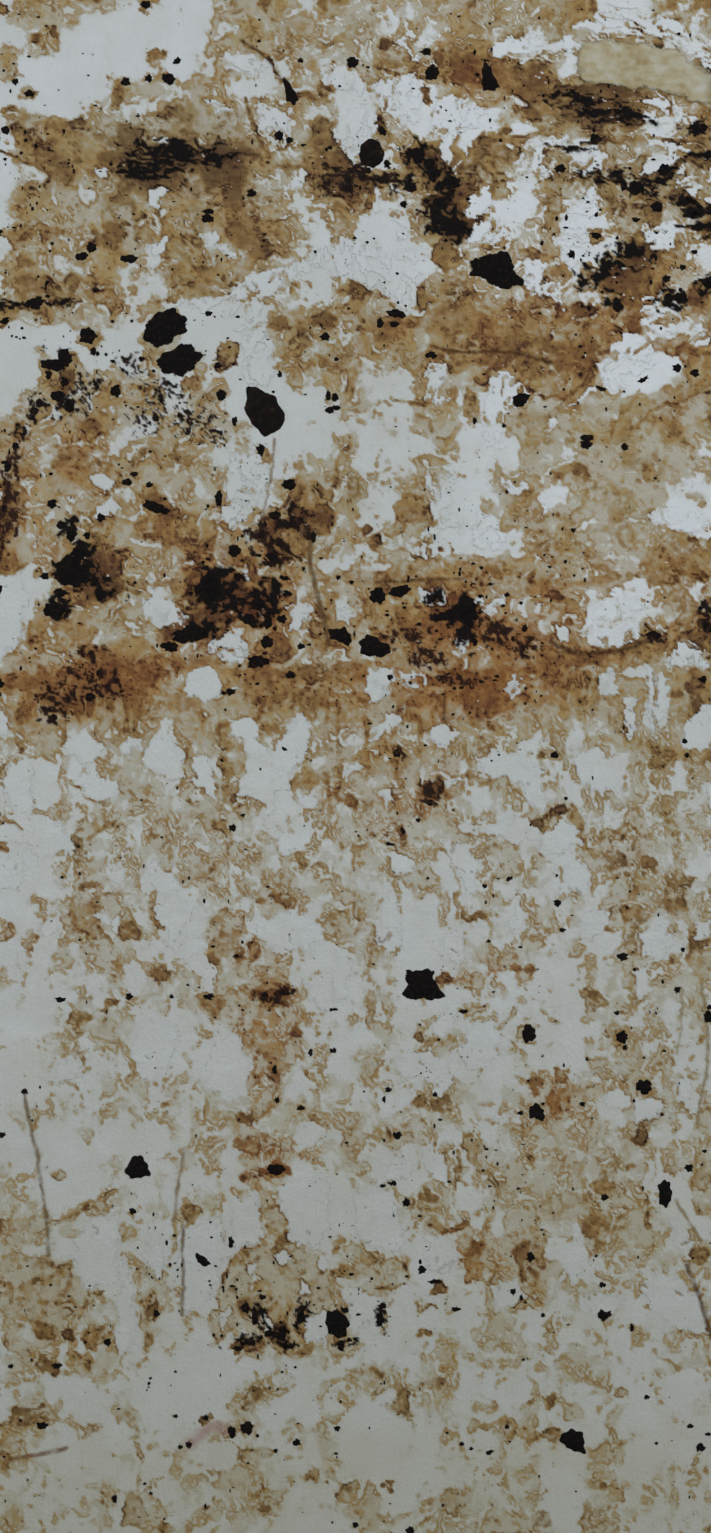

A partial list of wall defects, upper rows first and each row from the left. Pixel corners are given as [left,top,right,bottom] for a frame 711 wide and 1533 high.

corrosion [0,0,711,1077]
corrosion [0,847,711,1396]
damp [0,1317,711,1533]
damp [342,1191,430,1330]